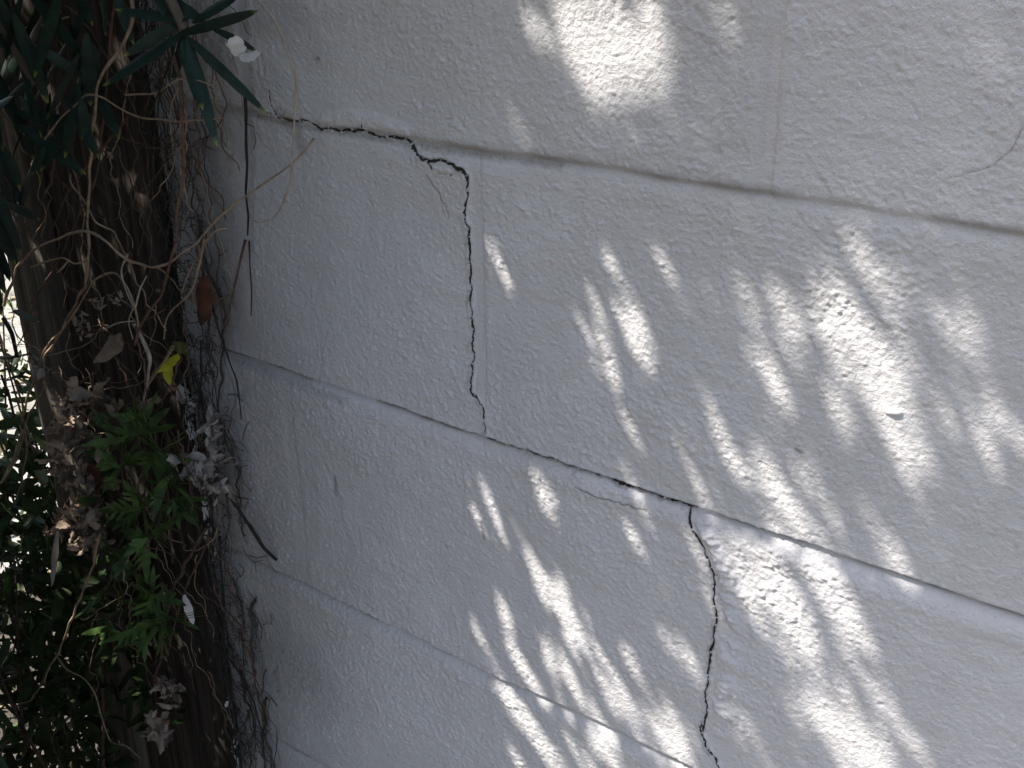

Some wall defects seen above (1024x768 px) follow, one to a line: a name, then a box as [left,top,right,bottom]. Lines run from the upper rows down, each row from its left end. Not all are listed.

crack [264,88,719,768]